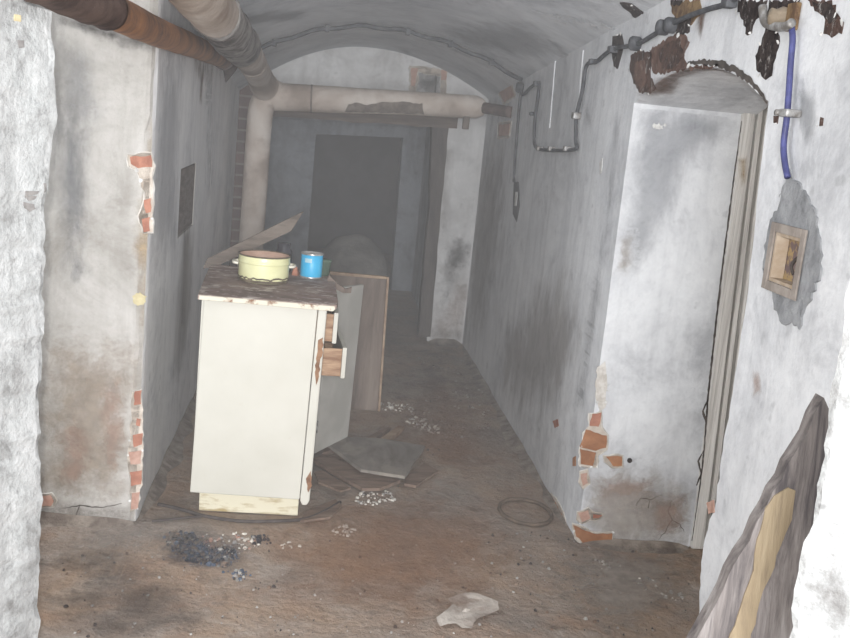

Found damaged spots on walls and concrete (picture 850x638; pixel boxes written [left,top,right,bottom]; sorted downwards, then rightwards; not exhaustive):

peeling [612,0,719,95]
peeling [754,28,780,80]
peeling [735,0,844,38]
flaking render [126,151,156,234]
crack [636,121,742,540]
flaking render [127,389,144,512]
flaking render [572,362,632,489]
flaking render [550,492,614,543]